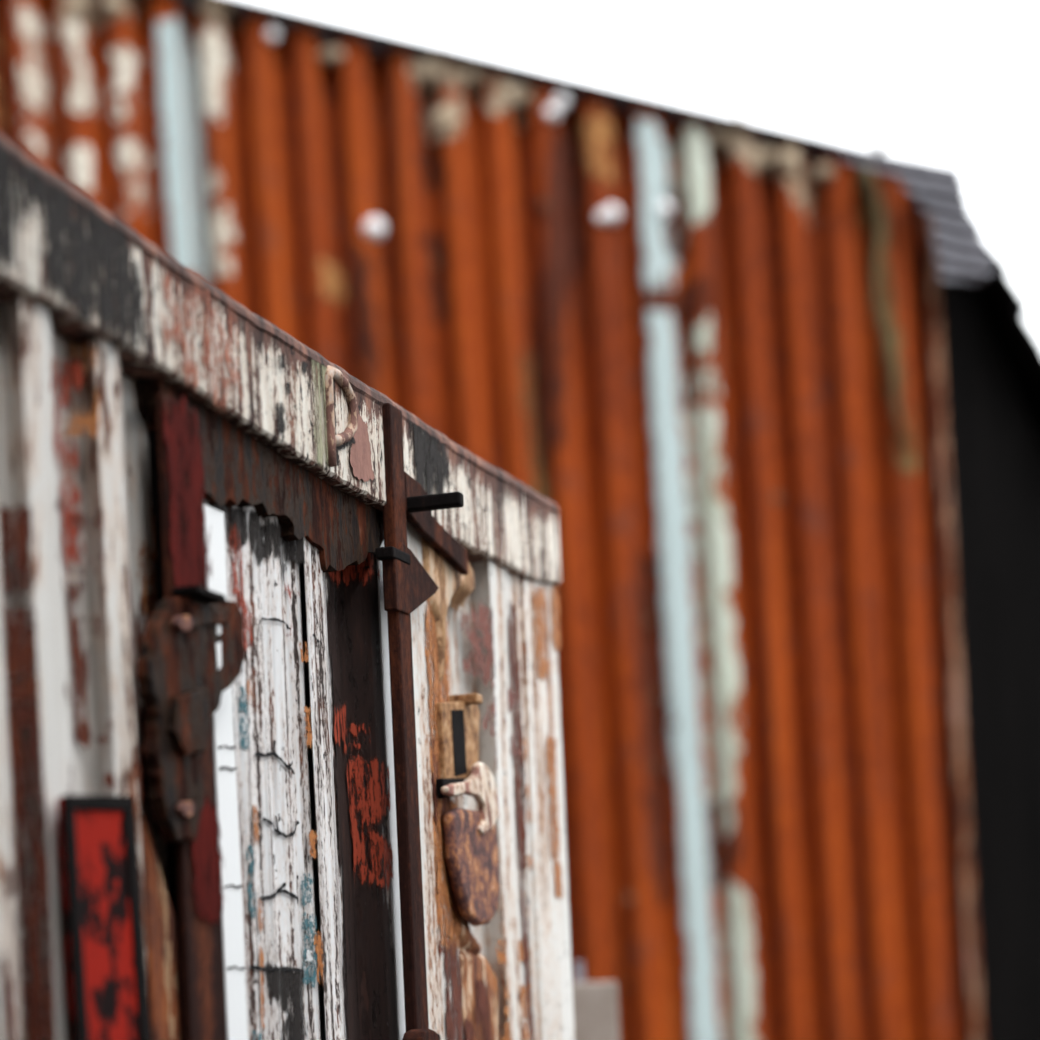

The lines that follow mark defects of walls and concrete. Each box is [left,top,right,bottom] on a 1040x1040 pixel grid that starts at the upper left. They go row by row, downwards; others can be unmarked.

peeling [276,382,291,435]
peeling [350,414,374,482]
peeling [163,395,305,588]
crack [261,617,322,644]
crack [218,740,295,774]
crack [263,816,299,838]
corrosion [326,552,398,1040]
corrosion [423,597,534,1040]
peeling [192,795,225,925]
crack [224,882,298,901]
crack [228,965,304,974]